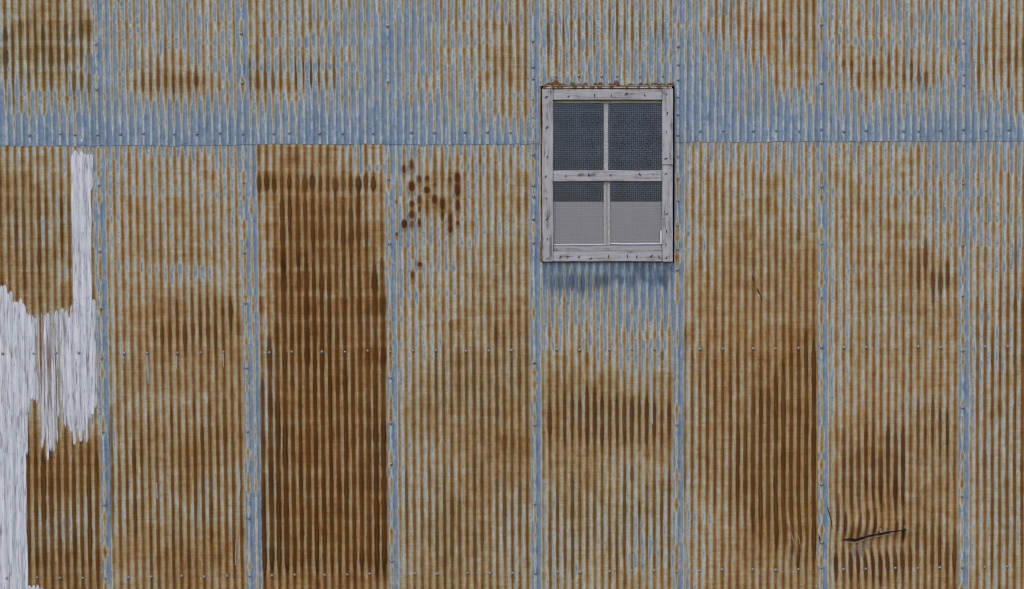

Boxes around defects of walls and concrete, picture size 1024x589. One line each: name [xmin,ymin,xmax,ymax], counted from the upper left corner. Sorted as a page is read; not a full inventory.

rust [543,80,674,89]
rust [396,161,460,236]
rust [161,302,217,349]
rust [257,175,387,577]
rust [548,388,671,445]
rust [132,439,142,532]
rust [194,427,213,537]
rust [736,339,816,567]
rust [852,431,905,503]
crack [819,507,906,543]
rust [834,521,918,581]
rust [931,529,956,571]